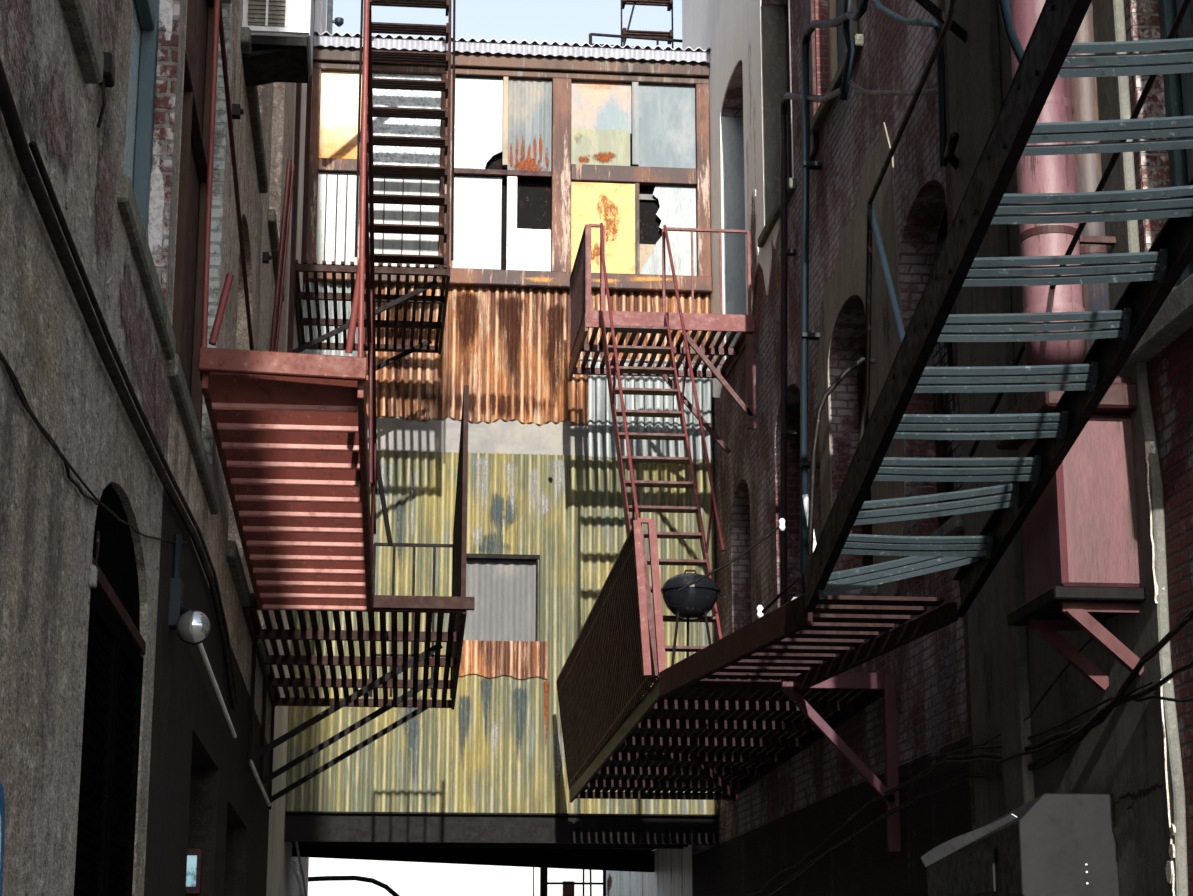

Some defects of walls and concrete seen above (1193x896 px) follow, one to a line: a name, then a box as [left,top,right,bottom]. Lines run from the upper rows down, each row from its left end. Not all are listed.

peeling [159,0,174,45]
corrosion [509,135,549,171]
corrosion [591,196,618,260]
corrosion [390,303,412,388]
corrosion [417,293,563,416]